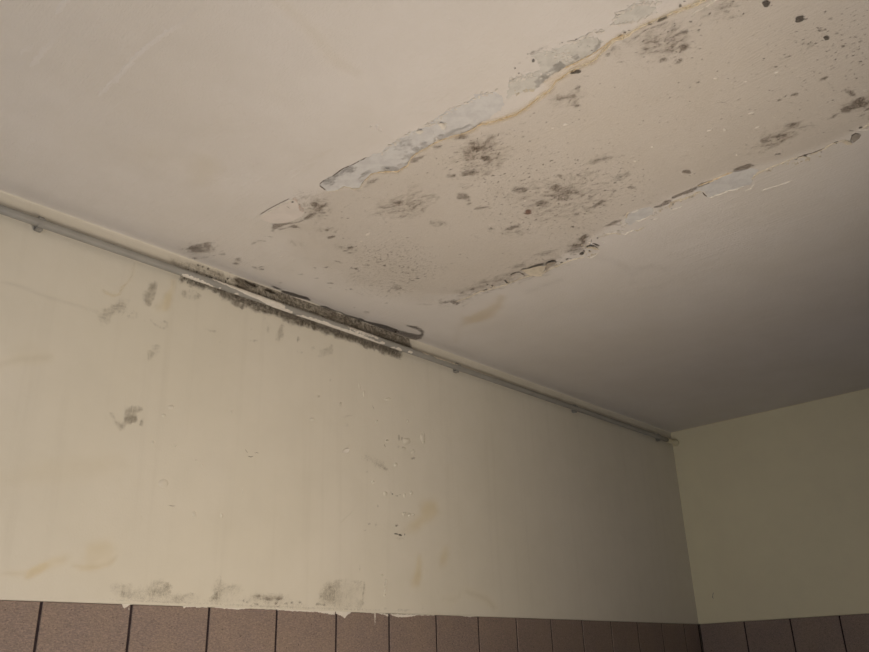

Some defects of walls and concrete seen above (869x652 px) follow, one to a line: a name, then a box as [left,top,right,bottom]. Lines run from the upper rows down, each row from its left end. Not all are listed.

peeling [320,0,662,191]
water stain [184,266,423,354]